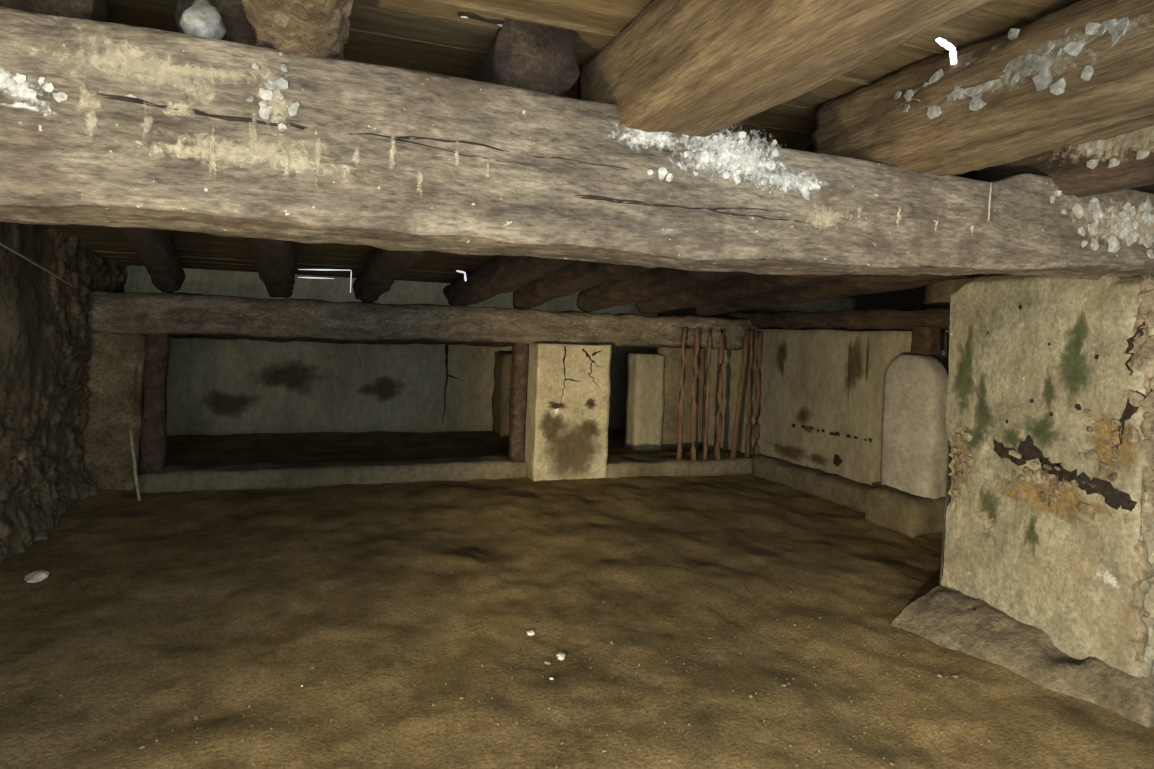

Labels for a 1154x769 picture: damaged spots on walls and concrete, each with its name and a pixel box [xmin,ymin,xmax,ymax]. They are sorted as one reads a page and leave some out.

leakage [1074,316,1086,349]
leakage [964,383,991,448]
leakage [1044,380,1054,407]
leakage [543,415,597,474]
spalling [993,404,1138,523]
leakage [969,505,999,536]
leakage [1026,519,1038,549]
leakage [1050,539,1120,591]